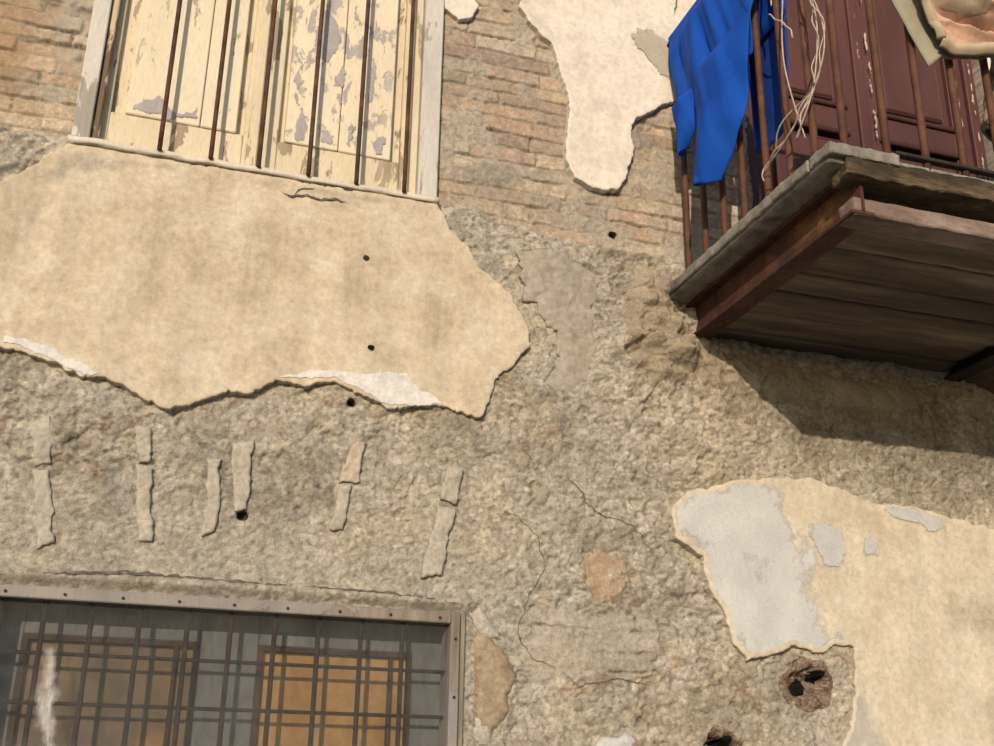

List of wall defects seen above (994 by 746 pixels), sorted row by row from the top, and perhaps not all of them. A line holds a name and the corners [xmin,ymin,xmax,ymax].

flaking render [444,0,479,23]
flaking render [517,0,696,194]
flaking render [0,143,531,420]
flaking render [30,416,55,549]
flaking render [669,477,994,746]